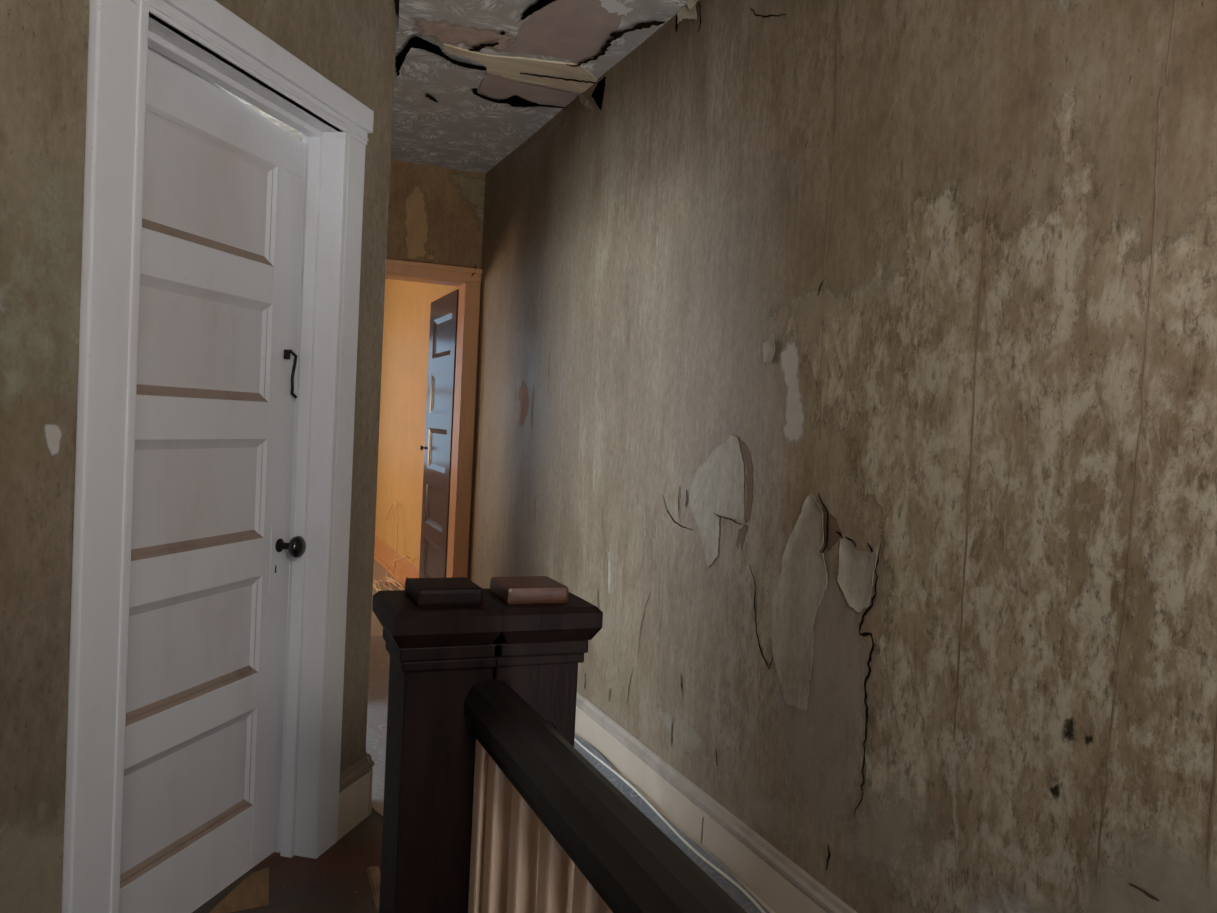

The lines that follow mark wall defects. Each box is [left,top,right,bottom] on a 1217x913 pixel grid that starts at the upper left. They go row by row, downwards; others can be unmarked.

peeling [511,0,634,63]
peeling [677,0,697,24]
peeling [780,341,804,441]
water stain [1065,720,1093,744]